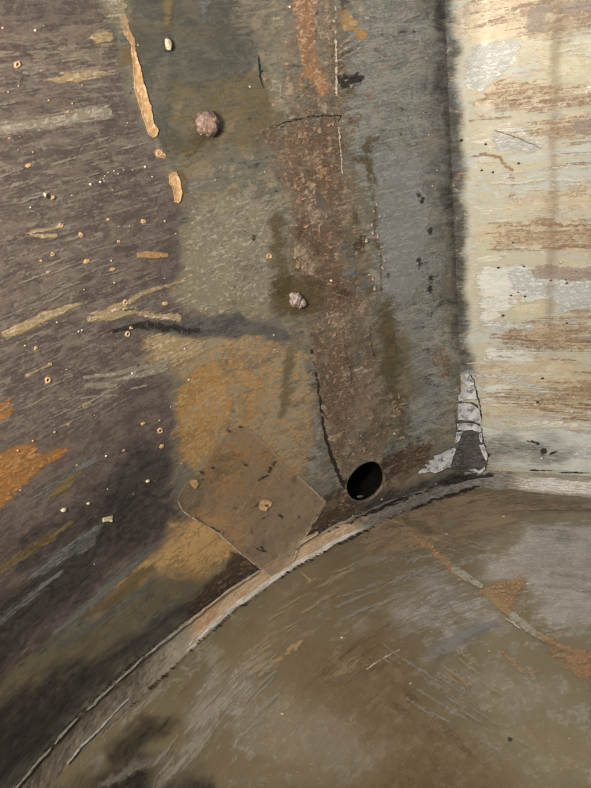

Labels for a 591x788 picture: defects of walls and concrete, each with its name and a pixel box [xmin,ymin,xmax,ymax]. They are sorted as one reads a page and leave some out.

rust [99,0,159,138]
crack [331,7,339,96]
rust [169,171,188,203]
crack [271,115,343,173]
rust [257,0,398,479]
rust [0,441,68,507]
crack [310,349,347,489]
peeling [418,370,490,474]
rust [408,532,591,685]